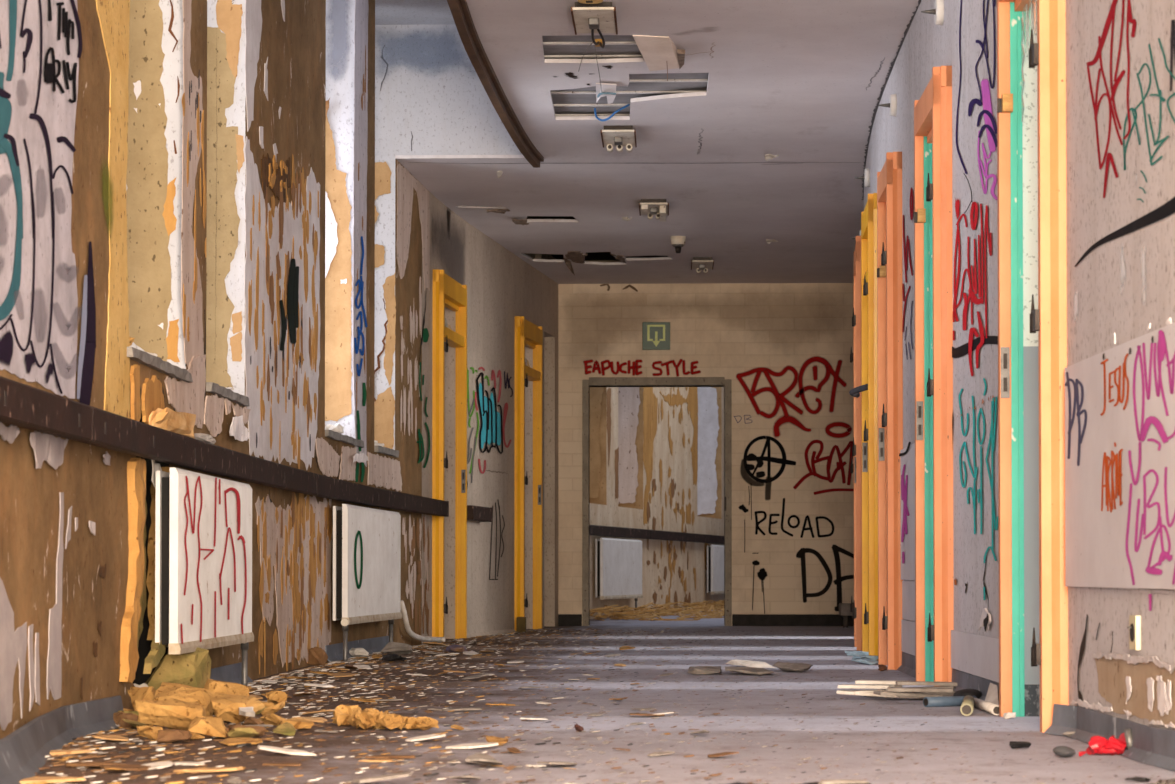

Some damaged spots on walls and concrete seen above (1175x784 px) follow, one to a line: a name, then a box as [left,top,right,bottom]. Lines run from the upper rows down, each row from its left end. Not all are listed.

peeling [96,0,430,492]
peeling [0,422,69,469]
peeling [0,492,96,731]
peeling [296,709,338,733]
peeling [249,492,387,699]
peeling [350,516,524,707]
peeling [590,387,719,609]
peeling [1070,652,1175,728]